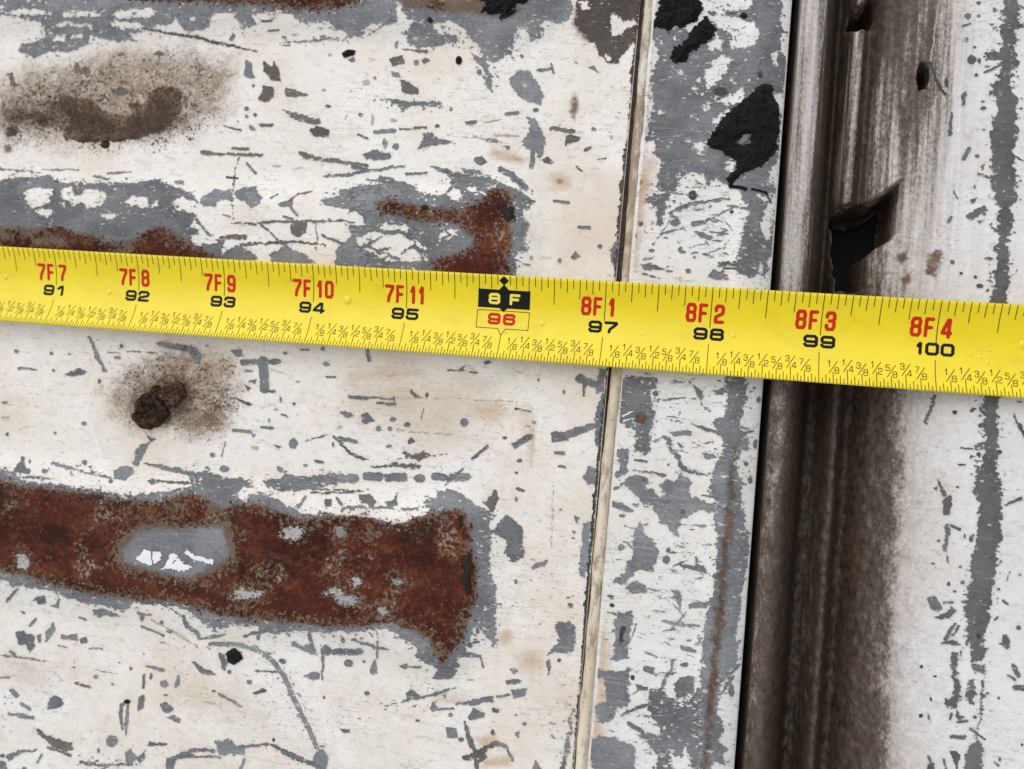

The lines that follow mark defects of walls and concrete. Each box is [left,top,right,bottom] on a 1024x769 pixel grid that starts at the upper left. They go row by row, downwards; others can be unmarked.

corrosion [0,223,220,259]
peeling [0,41,607,267]
corrosion [340,170,535,276]
peeling [573,0,640,73]
peeling [635,0,791,280]
peeling [948,0,1024,304]
peeling [263,390,489,516]
corrosion [0,465,509,672]
peeling [590,375,761,769]
peeling [927,395,1024,769]
peeling [0,676,328,769]
peeling [430,667,527,769]